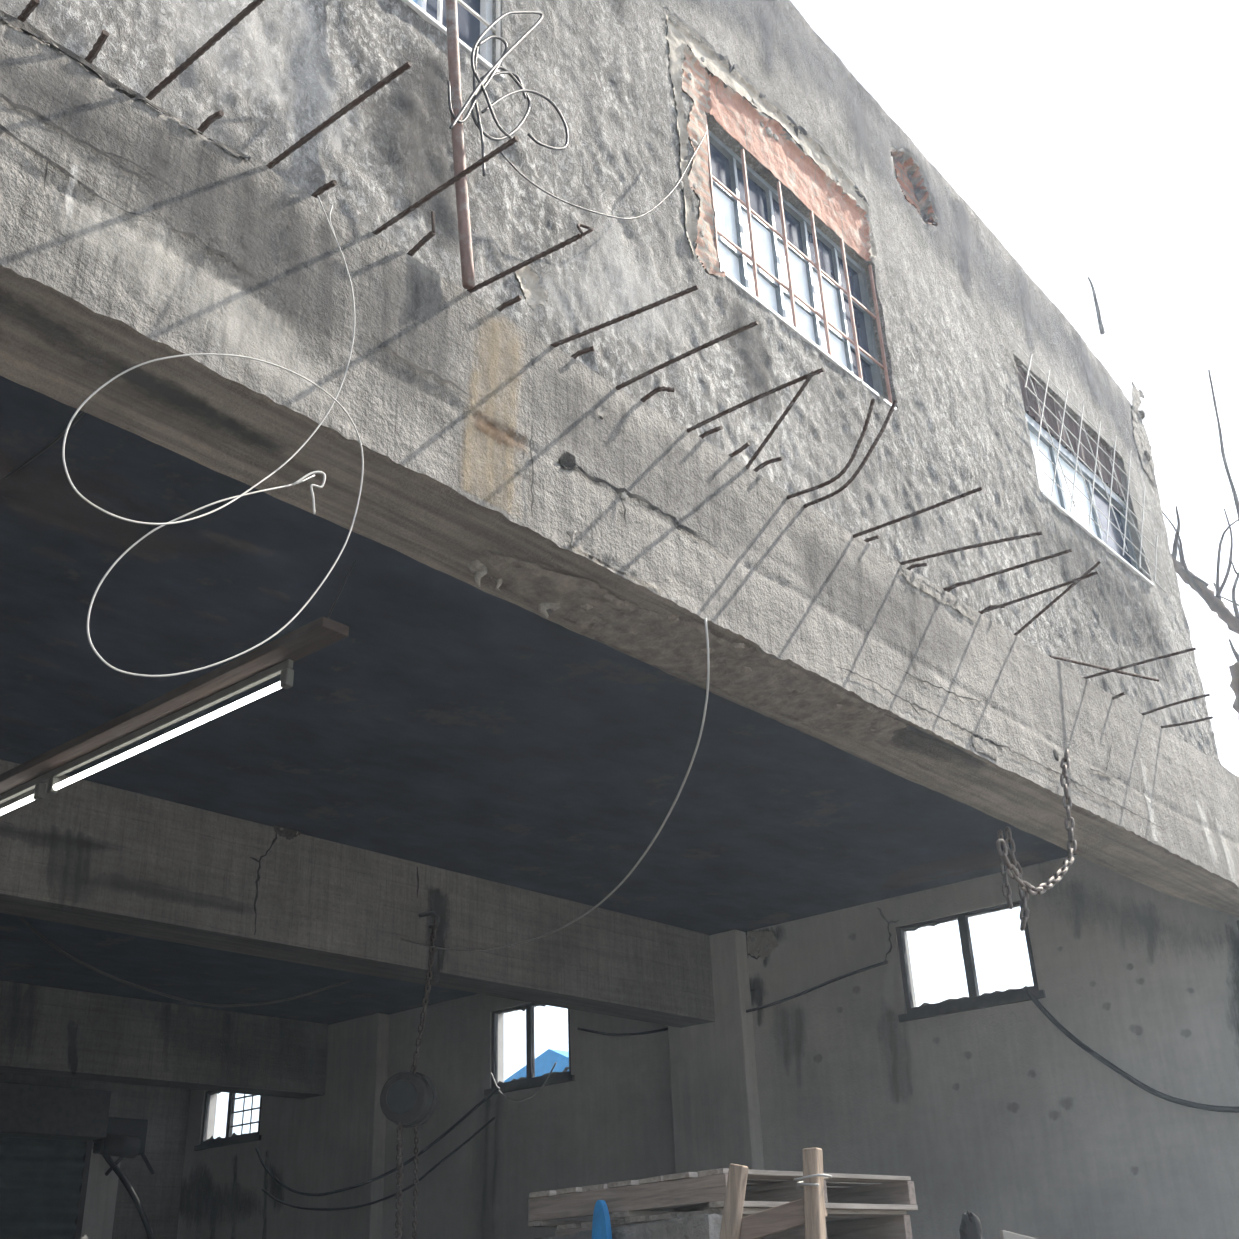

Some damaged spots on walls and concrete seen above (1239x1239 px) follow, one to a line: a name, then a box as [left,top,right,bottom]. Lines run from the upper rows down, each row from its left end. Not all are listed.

crack [0,93,264,287]
flaking render [666,15,878,278]
spalling [891,150,938,225]
spalling [549,285,699,359]
spalling [616,320,759,403]
spalling [687,367,825,472]
spalling [478,550,909,747]
crack [250,834,277,935]